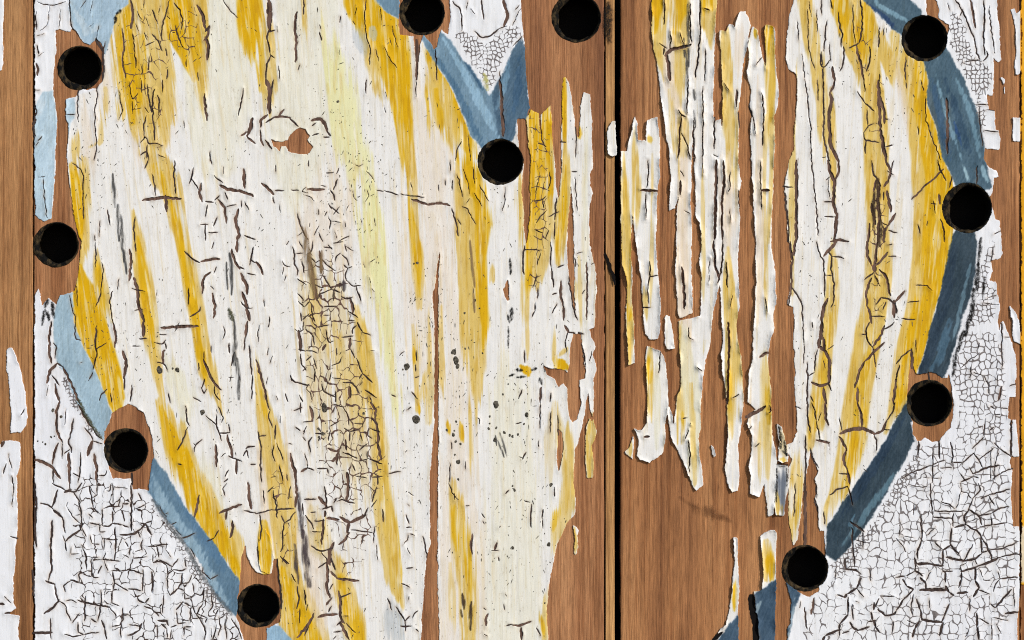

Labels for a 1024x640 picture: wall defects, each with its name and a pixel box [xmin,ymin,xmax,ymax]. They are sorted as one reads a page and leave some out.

peeling [0,0,104,640]
crack [0,0,506,640]
peeling [271,128,313,155]
peeling [421,253,440,640]
crack [516,387,559,459]
crack [522,126,616,367]
peeling [517,0,826,640]
crack [640,0,1022,640]